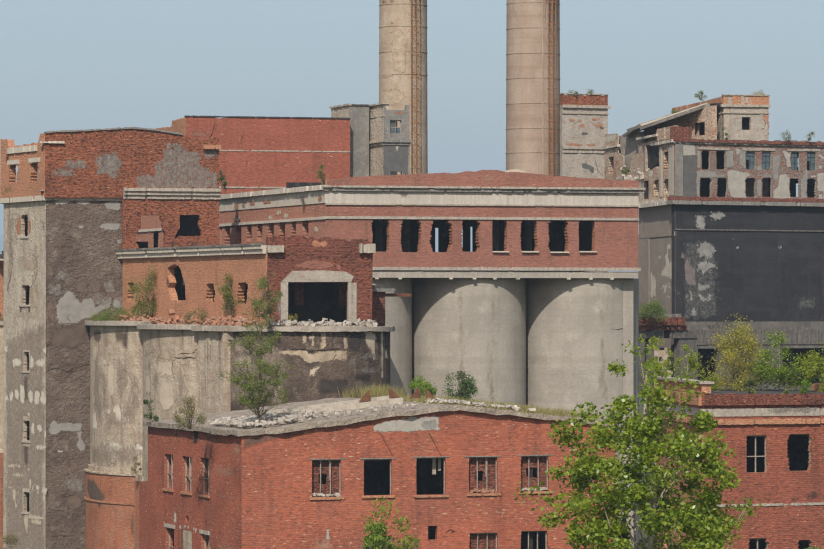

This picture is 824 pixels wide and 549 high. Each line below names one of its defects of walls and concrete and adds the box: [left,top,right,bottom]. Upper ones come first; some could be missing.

flaking render [95,152,122,178]
flaking render [136,143,218,188]
flaking render [683,144,791,199]
flaking render [801,150,824,199]
peeling [695,210,726,229]
peeling [650,241,718,316]
flaking render [4,346,46,369]
water stain [303,332,332,349]
water stain [365,331,390,378]
flaking render [145,360,174,410]
flaking render [5,385,47,450]
flaking render [93,394,129,430]